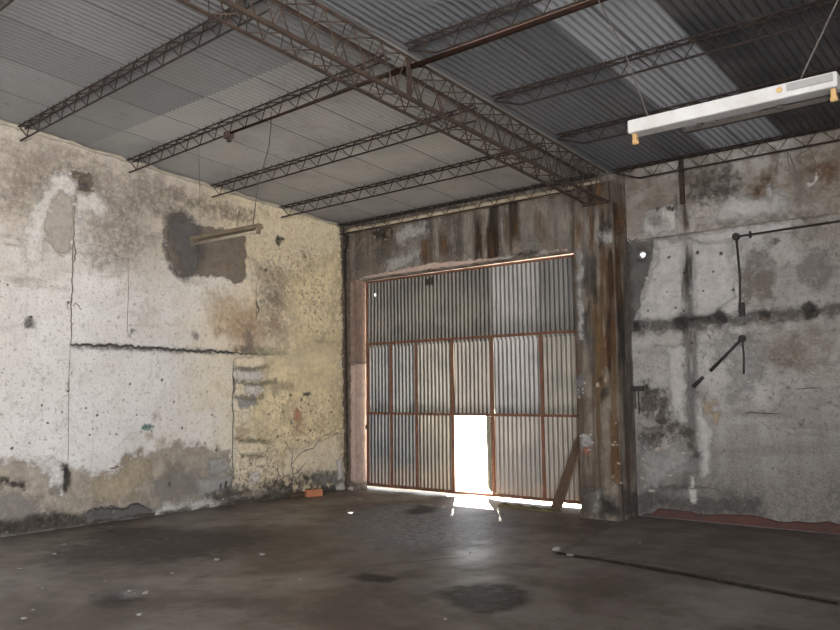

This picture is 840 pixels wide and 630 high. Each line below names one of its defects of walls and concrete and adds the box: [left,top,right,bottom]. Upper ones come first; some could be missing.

peeling [17,170,109,266]
flaking render [163,213,249,284]
water stain [0,253,343,563]
crack [63,193,287,500]
rust [592,246,619,479]
water stain [459,181,840,519]
peeling [37,450,71,492]
flaking render [85,504,154,524]
crack [273,429,338,490]